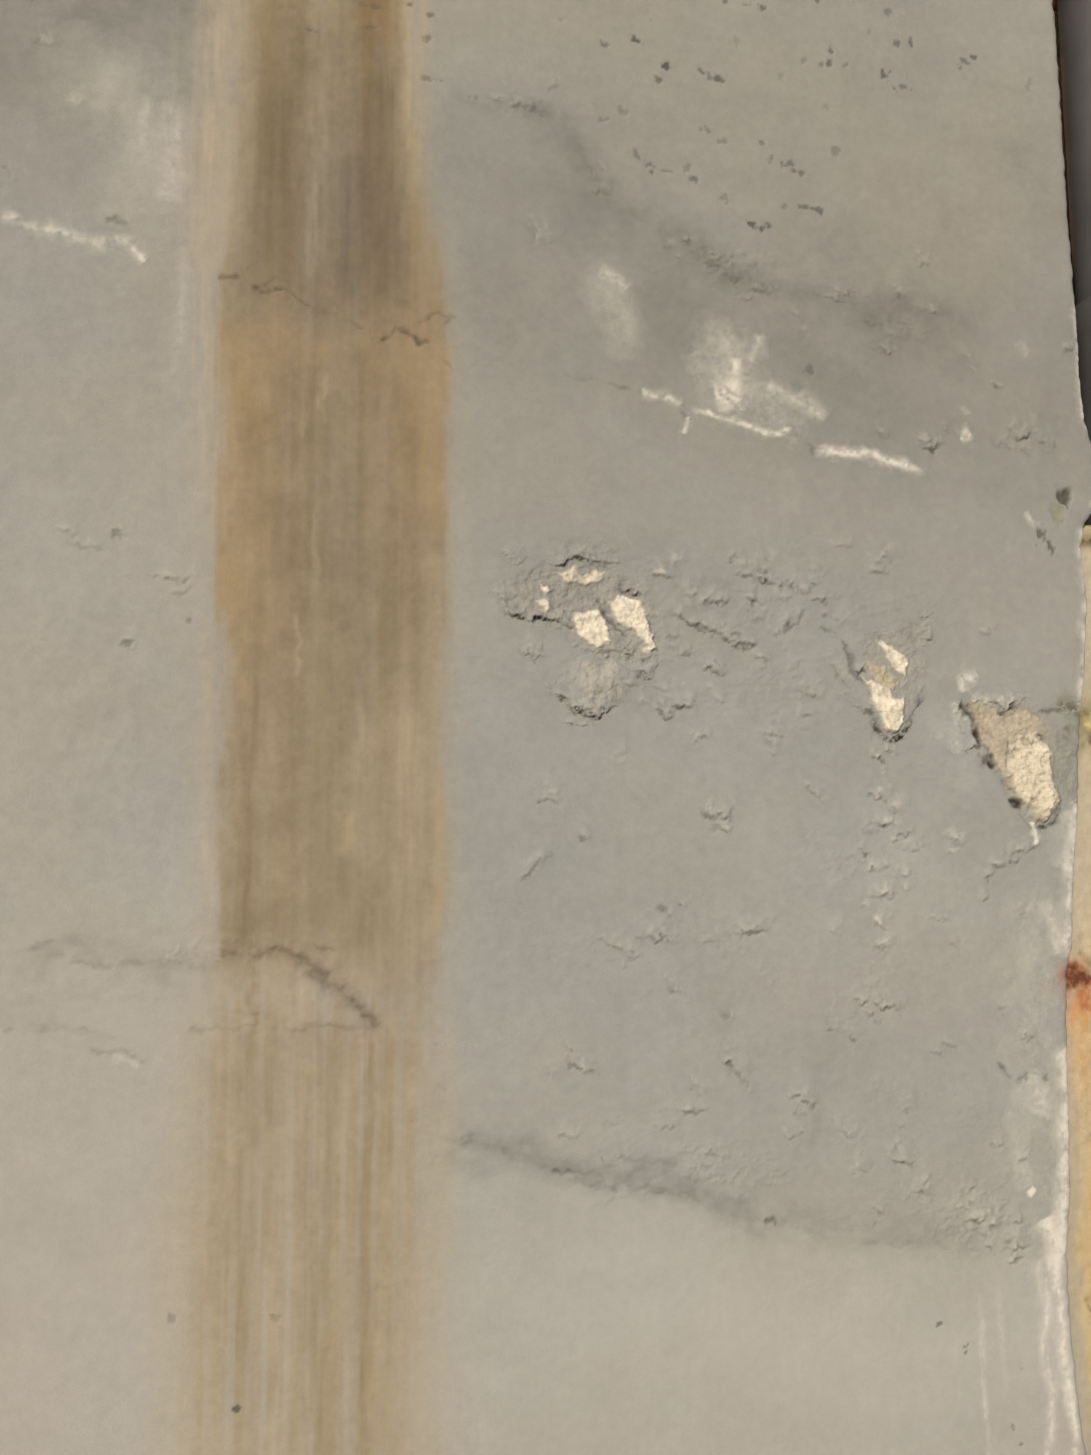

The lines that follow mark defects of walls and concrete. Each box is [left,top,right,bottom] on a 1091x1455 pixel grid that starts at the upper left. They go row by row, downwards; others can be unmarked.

efflorescence [575,255,649,363]
damp [680,227,939,451]
damp [1067,287,1091,447]
flaking render [488,530,670,731]
flaking render [817,607,1081,846]
damp [1069,498,1091,691]
crack [186,929,954,1254]
damp [991,793,1091,1455]
corrosion [1032,928,1091,1145]